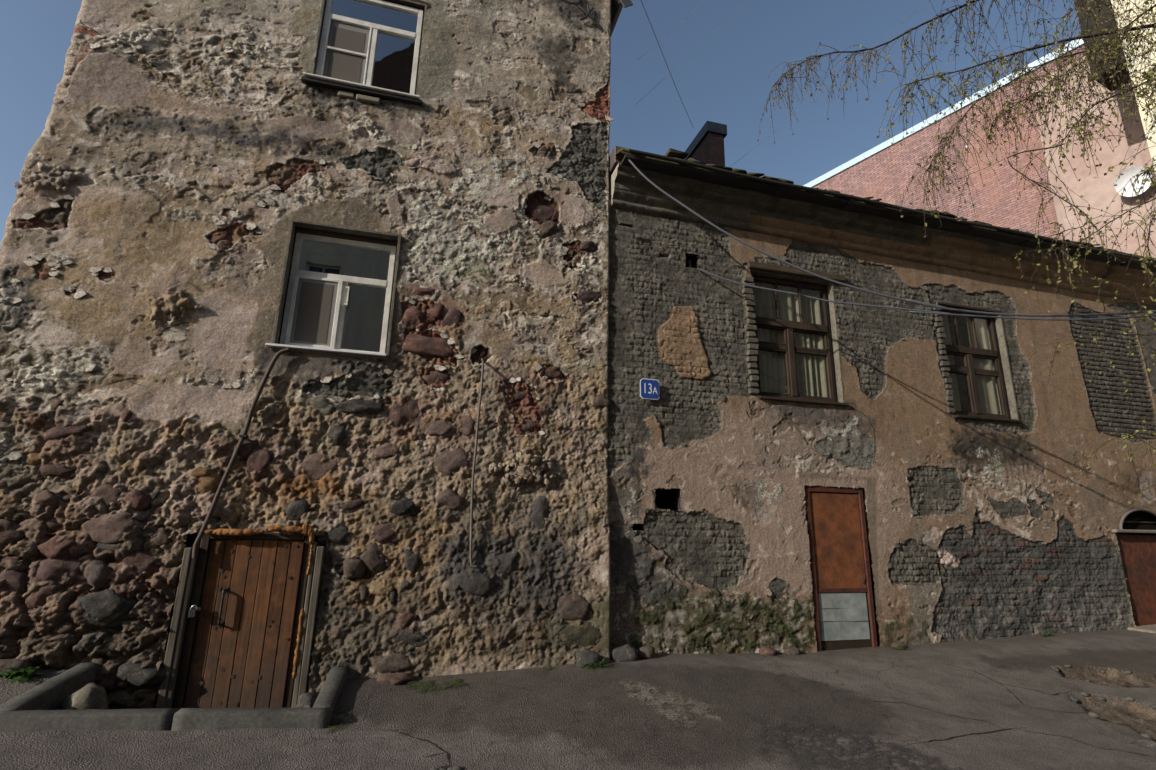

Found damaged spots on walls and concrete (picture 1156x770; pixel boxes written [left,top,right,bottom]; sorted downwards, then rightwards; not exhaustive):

spalling [13,194,74,230]
spalling [163,204,262,253]
spalling [257,159,327,208]
peeling [341,116,499,181]
spalling [522,191,559,225]
flaking render [529,81,1036,475]
spalling [401,298,492,388]
spalling [500,363,571,435]
flaking render [1068,302,1156,443]
flaking render [632,488,750,592]
flaking render [886,466,1134,643]